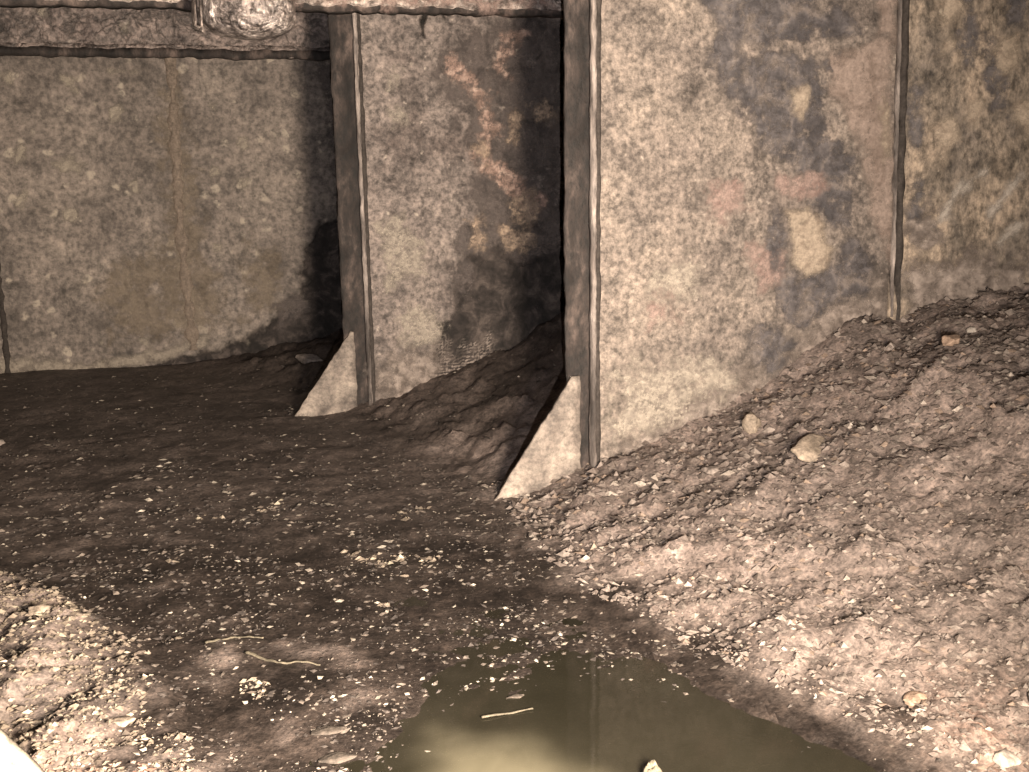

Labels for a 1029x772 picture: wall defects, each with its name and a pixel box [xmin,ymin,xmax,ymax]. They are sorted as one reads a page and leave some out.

damp [375,18,565,399]
damp [608,0,888,456]